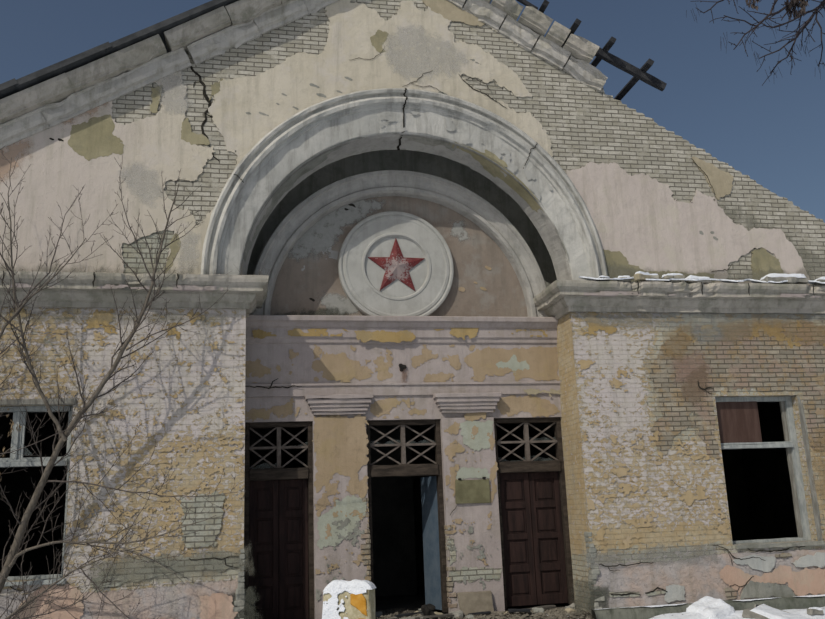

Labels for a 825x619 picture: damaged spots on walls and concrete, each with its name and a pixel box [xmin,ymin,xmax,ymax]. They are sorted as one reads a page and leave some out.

flaking render [49,83,165,161]
crack [190,66,219,161]
flaking render [164,8,330,225]
crack [397,71,441,150]
crack [460,76,506,108]
flaking render [351,0,825,282]
peeling [65,381,427,584]
peeling [411,328,561,537]
flaking render [576,312,825,615]
crack [599,562,654,571]
crack [611,587,668,596]
crack [713,545,805,591]